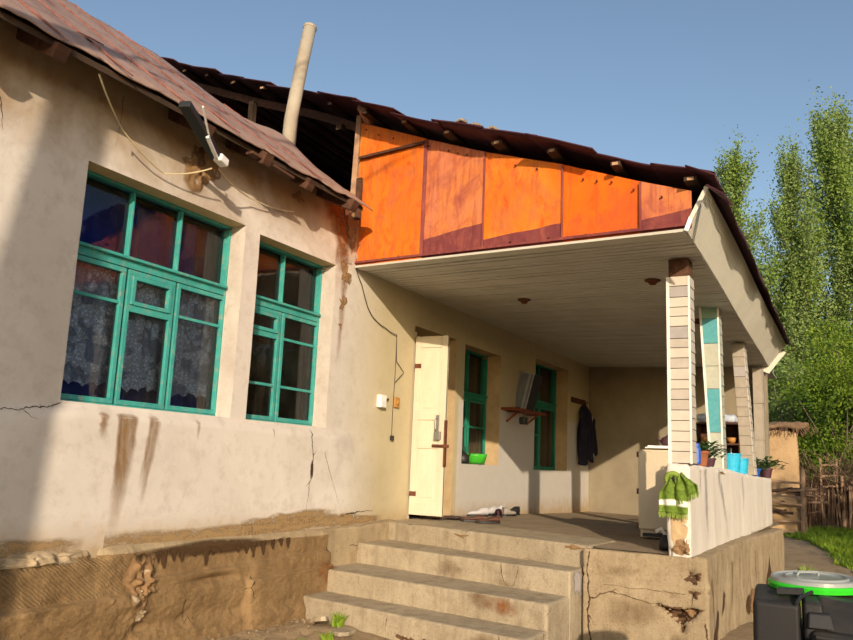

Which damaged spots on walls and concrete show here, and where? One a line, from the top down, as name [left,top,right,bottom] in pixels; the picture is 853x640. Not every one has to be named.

rust [328,202,349,265]
crack [0,402,61,419]
damp [116,416,136,483]
crack [306,429,372,516]
spalling [0,540,77,570]
flaking render [103,510,376,548]
flaking render [671,513,690,556]
spalling [122,554,159,622]
crack [586,551,694,640]
spalling [652,571,705,633]
spalling [746,589,755,614]